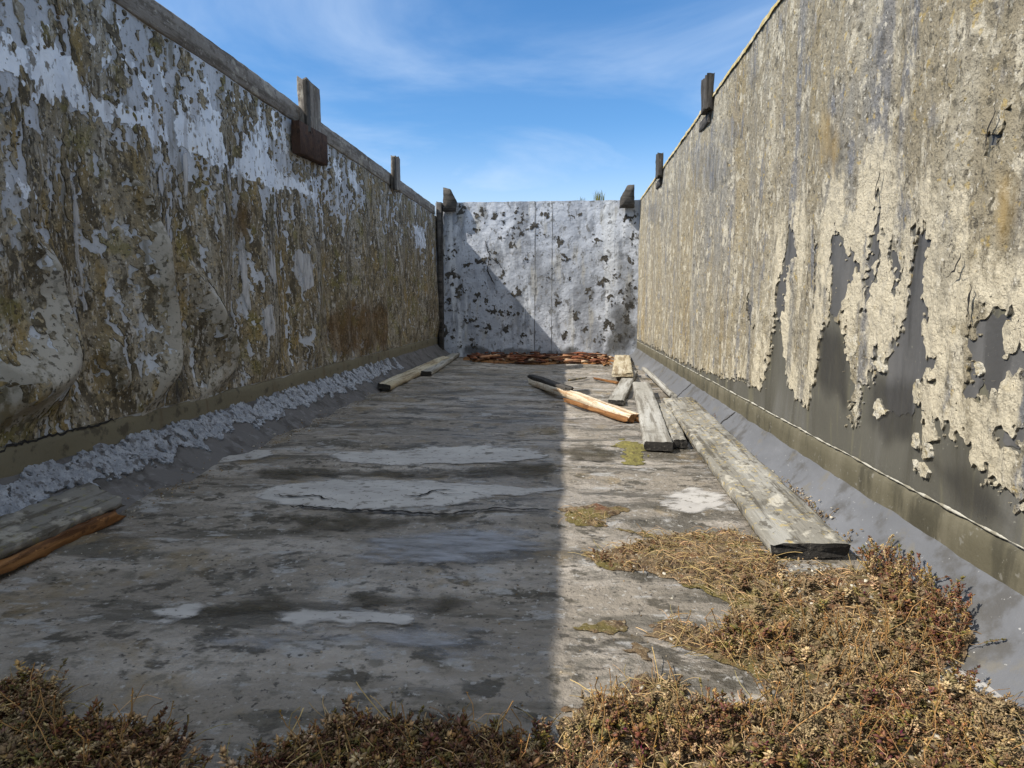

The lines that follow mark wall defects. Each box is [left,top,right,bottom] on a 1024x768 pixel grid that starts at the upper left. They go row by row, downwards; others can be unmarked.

peeling [0,11,319,205]
peeling [332,158,357,192]
spalling [444,203,570,350]
spalling [573,214,639,343]
spalling [776,227,797,323]
spalling [829,191,936,419]
spalling [963,314,1024,399]
spalling [911,433,934,478]
spalling [1003,428,1024,449]